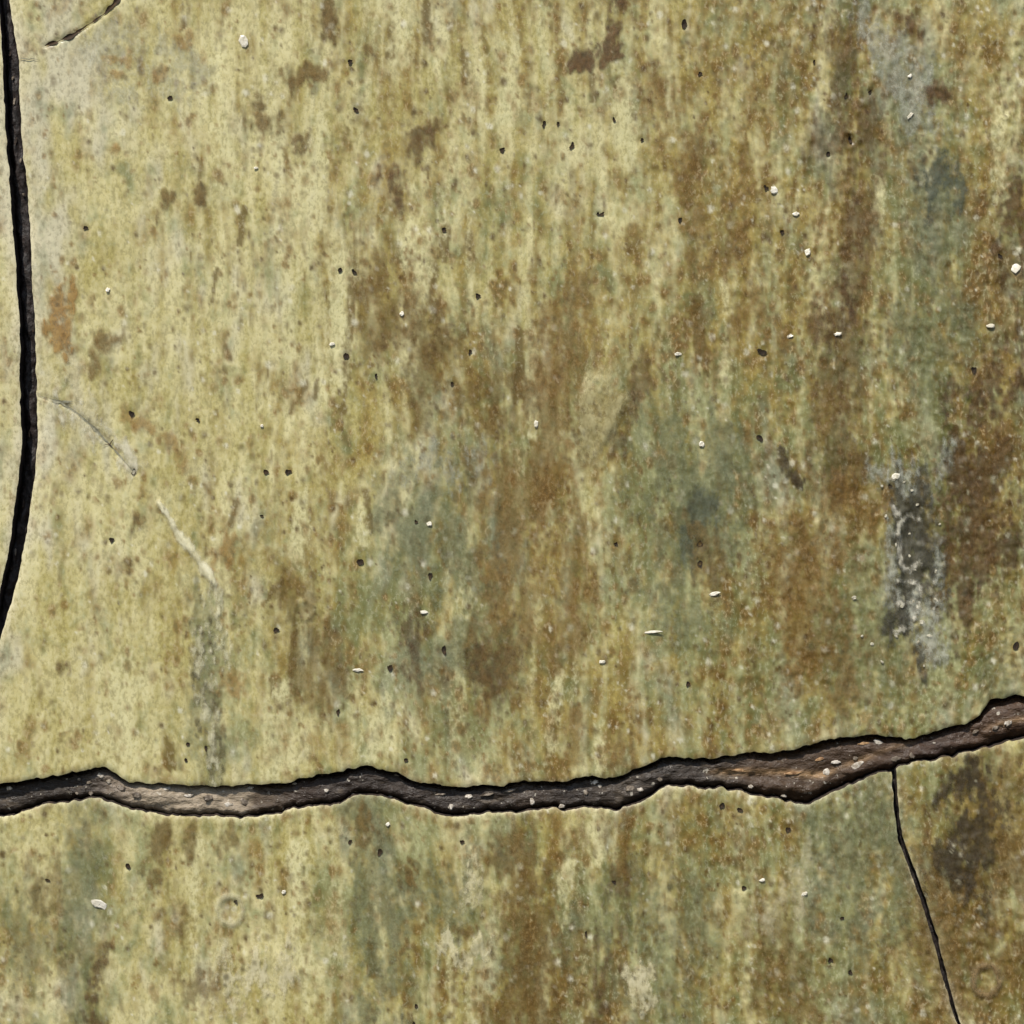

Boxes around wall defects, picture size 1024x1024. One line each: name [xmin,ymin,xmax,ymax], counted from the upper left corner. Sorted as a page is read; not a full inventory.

corrosion [42,276,78,362]
crack [0,0,138,639]
crack [0,500,1024,1024]